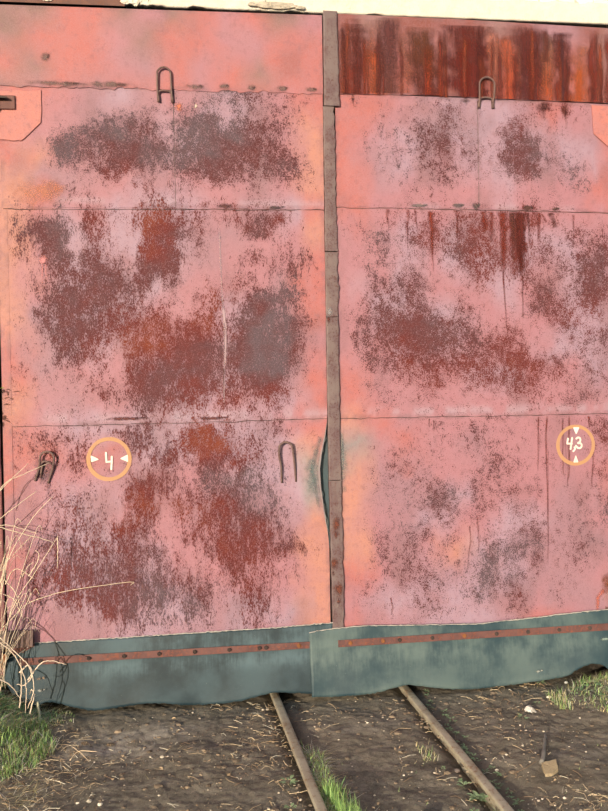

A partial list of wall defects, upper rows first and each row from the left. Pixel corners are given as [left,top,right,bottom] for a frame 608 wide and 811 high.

corrosion [9,90,331,638]
corrosion [339,19,608,625]